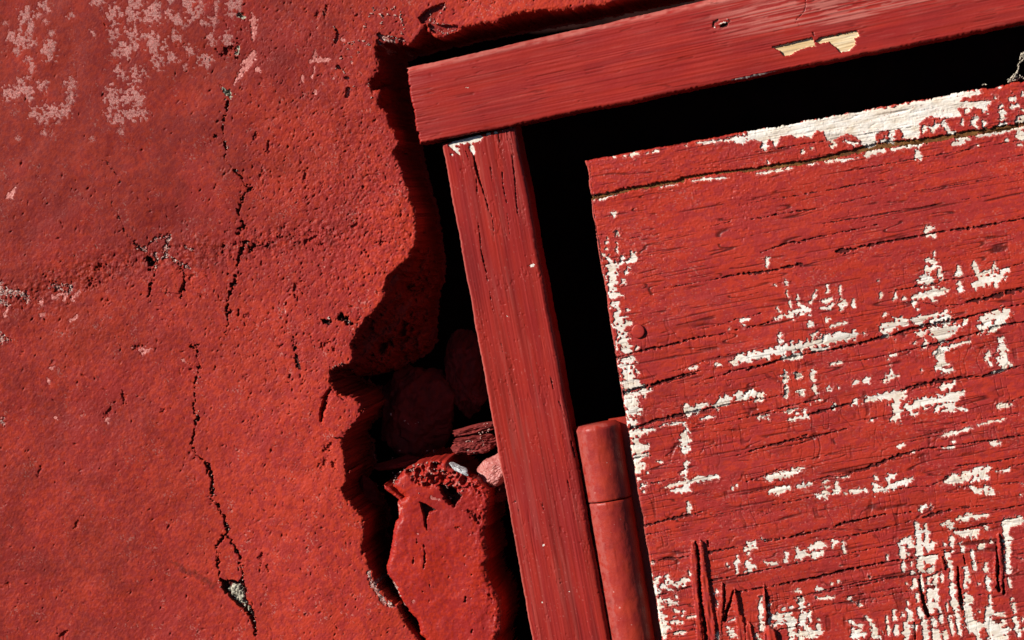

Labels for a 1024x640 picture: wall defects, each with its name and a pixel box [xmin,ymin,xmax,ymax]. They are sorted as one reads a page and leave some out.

peeling [89,0,261,135]
peeling [773,31,859,56]
peeling [685,86,1024,175]
crack [213,101,291,327]
peeling [602,230,767,514]
peeling [714,251,1013,424]
crack [190,344,244,579]
peeling [764,467,914,501]
peeling [944,465,1010,496]
peeling [651,560,696,639]
peeling [726,537,847,574]
peeling [754,504,1024,640]